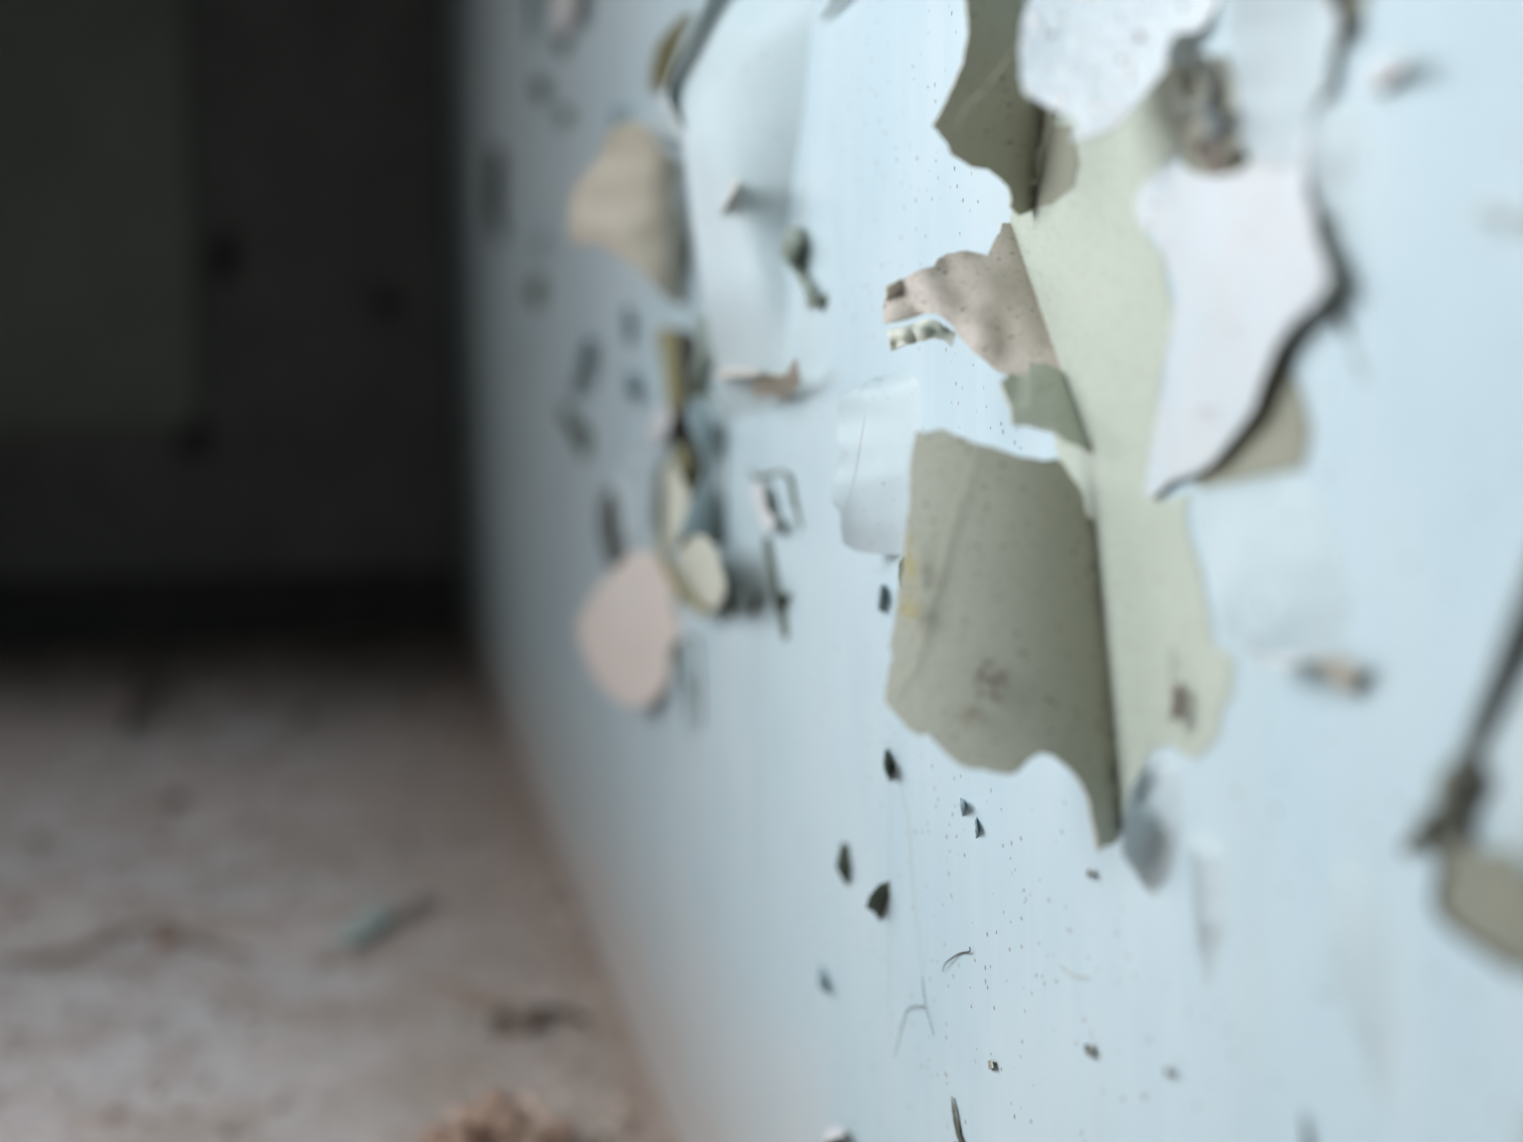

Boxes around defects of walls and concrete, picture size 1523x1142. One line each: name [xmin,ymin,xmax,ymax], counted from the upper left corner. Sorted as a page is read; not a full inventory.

peeling [650,9,693,95]
peeling [817,0,847,22]
peeling [817,292,828,312]
peeling [558,336,595,459]
peeling [569,121,802,707]
peeling [830,0,1368,992]